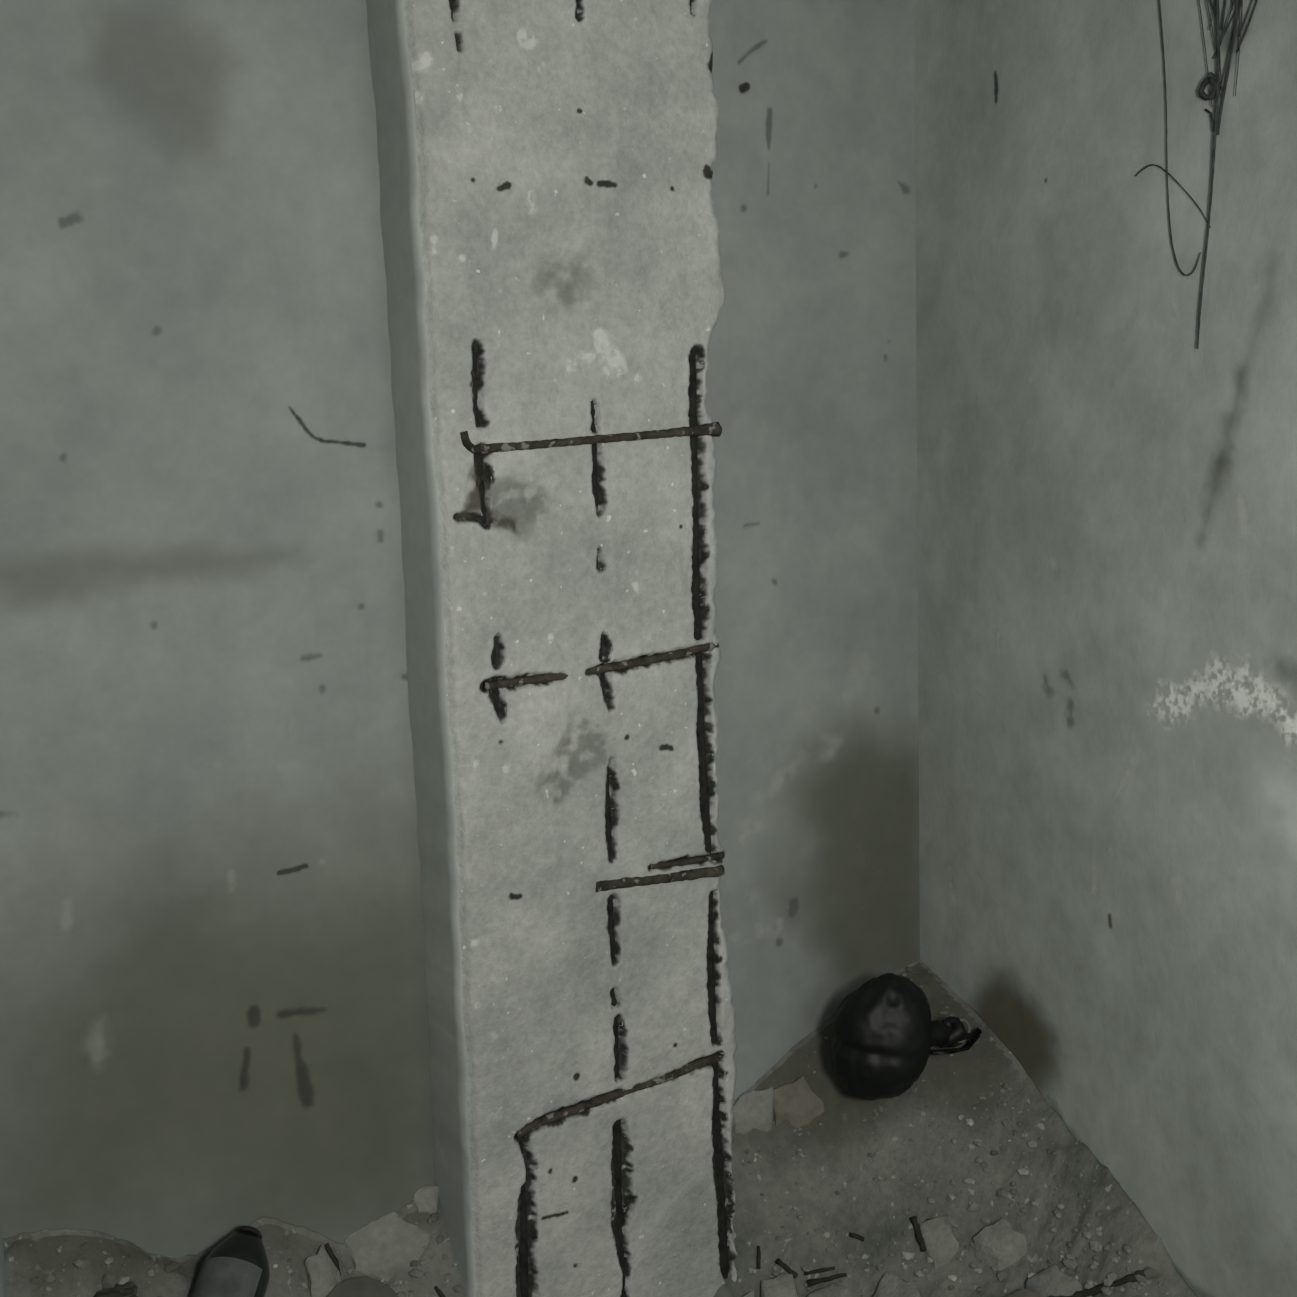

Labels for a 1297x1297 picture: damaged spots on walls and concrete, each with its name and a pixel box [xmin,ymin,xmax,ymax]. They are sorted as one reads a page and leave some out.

spalling [585,177,617,187]
spalling [470,339,489,427]
spalling [453,443,495,529]
rust [462,470,514,529]
spalling [585,345,725,871]
spalling [480,636,560,721]
leakage [1153,659,1297,745]
spalling [608,895,620,965]
spalling [614,1002,653,1086]
spalling [671,898,737,1273]
spalling [514,1094,615,1297]
spalling [611,1123,636,1297]